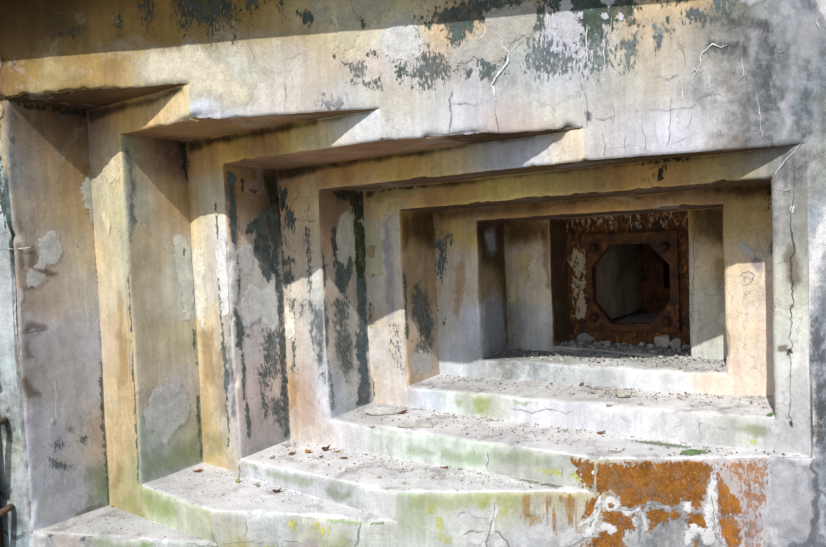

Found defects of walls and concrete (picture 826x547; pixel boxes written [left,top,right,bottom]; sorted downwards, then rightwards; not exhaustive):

crack [448,87,475,130]
crack [479,24,517,131]
flaking render [550,0,586,72]
flaking render [598,0,624,21]
crack [579,43,744,157]
water stain [778,101,792,139]
crack [775,144,800,426]
water stain [784,206,826,467]
crack [457,497,510,547]
crack [569,495,661,547]
rust [520,455,771,547]
crack [789,459,826,547]